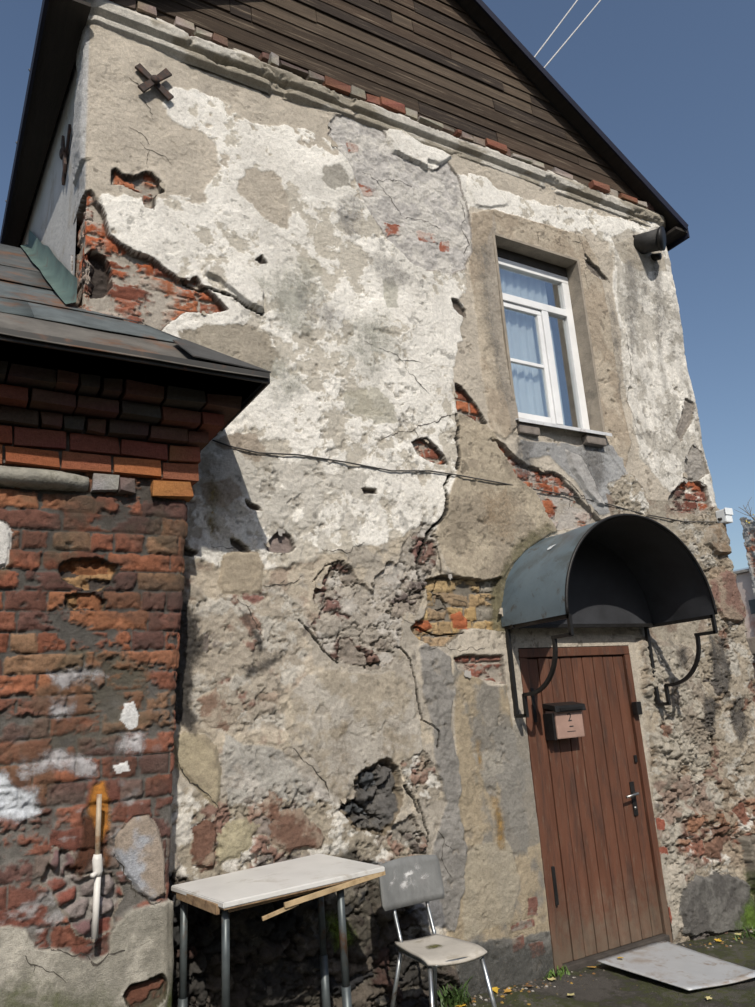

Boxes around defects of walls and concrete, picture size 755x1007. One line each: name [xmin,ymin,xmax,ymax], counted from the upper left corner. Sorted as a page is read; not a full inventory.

spalling [111,167,165,209]
spalling [72,189,229,331]
crack [363,172,470,256]
crack [365,341,426,390]
spalling [411,437,449,465]
spalling [490,438,649,531]
spalling [668,398,712,520]
spalling [311,521,503,671]
crack [383,413,487,748]
water stain [174,601,203,731]
spalling [339,749,445,855]
spalling [124,972,168,1007]